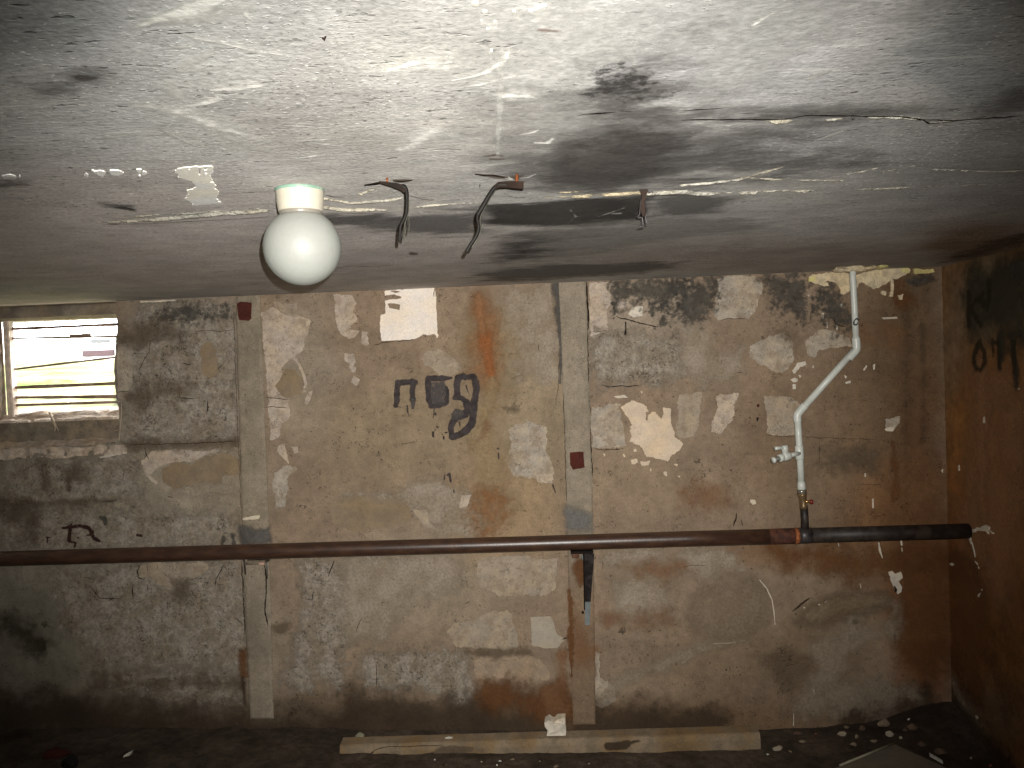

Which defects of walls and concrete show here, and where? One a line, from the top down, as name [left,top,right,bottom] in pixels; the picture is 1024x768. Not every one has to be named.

crack [686,108,1016,124]
peeling [0,300,241,551]
peeling [261,301,313,510]
corrosion [466,294,509,503]
peeling [505,420,554,484]
water stain [607,276,723,335]
peeling [589,275,852,477]
water stain [757,273,852,337]
corrosion [480,559,584,721]
flaking render [888,571,903,594]